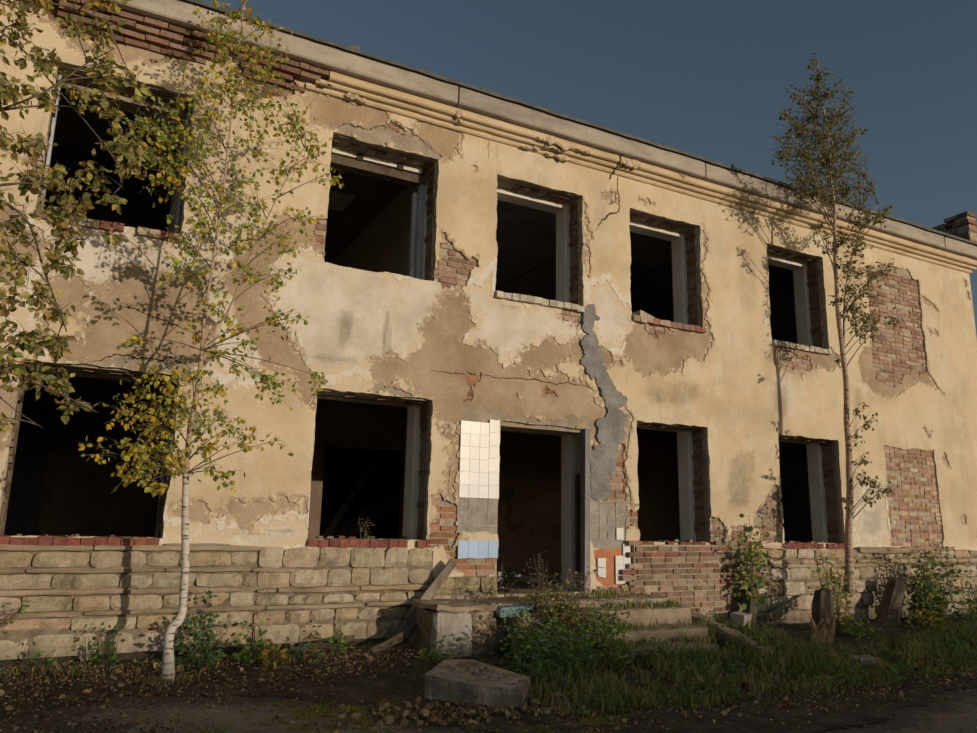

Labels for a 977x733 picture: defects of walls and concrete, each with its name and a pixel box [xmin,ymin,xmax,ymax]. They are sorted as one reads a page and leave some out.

flaking render [47,0,463,161]
crack [609,155,623,180]
peeling [0,199,713,586]
peeling [766,343,840,375]
flaking render [859,264,938,397]